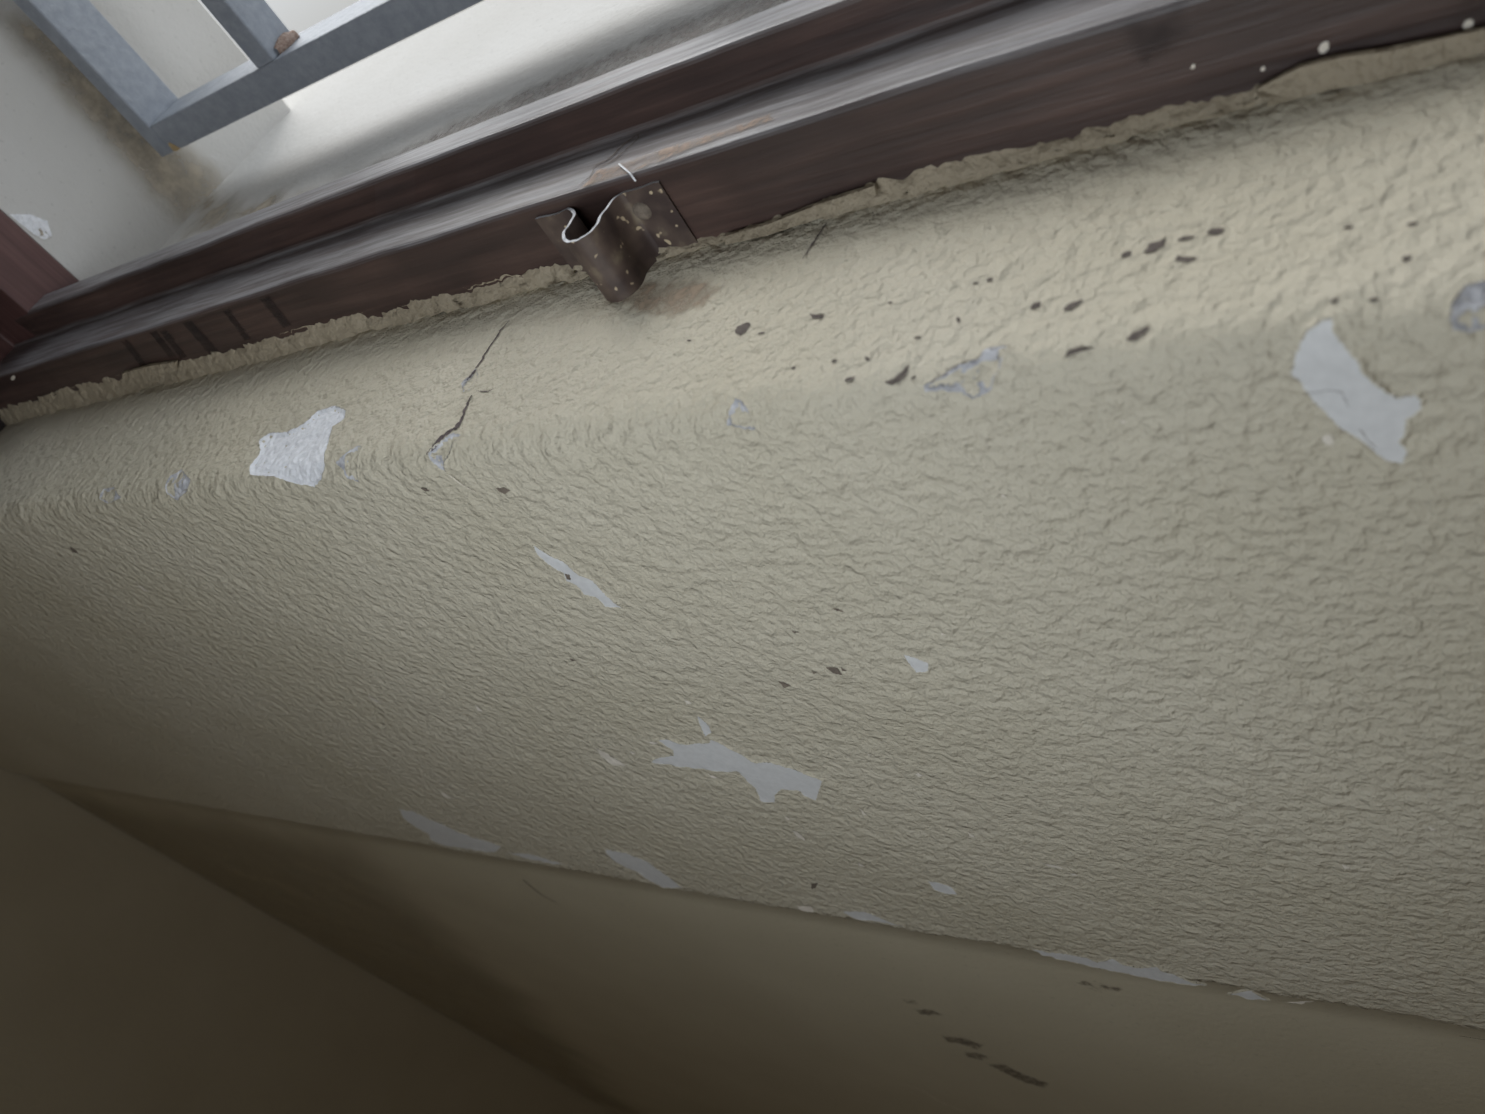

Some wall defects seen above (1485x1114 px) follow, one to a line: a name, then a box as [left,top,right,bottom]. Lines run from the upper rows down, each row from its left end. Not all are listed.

spalling [1121,227,1225,263]
crack [426,320,510,493]
spalling [735,322,765,336]
spalling [885,344,1011,401]
spalling [1065,347,1093,357]
spalling [1126,326,1150,341]
peeling [1284,298,1428,466]
spalling [249,405,348,488]
peeling [596,714,825,804]
peeling [398,808,573,867]
peeling [592,849,684,889]
peeling [841,910,907,928]